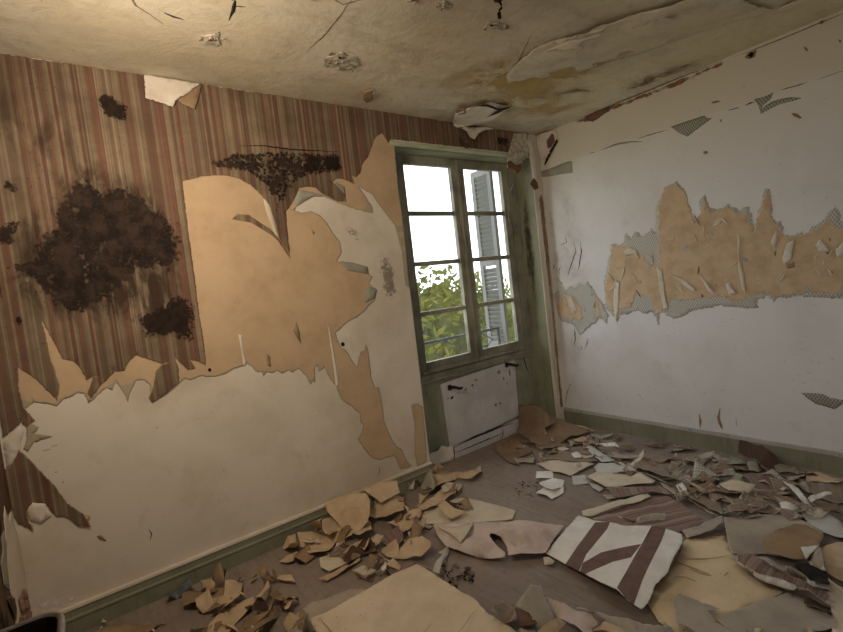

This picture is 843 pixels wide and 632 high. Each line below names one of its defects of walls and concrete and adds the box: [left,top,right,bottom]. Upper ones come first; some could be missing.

crack [306,0,360,52]
leakage [475,62,600,113]
leakage [212,150,342,211]
leakage [0,221,20,244]
leakage [7,172,195,341]
peeling [539,181,843,407]
peeling [4,423,24,467]
peeling [27,503,51,523]
flaking render [0,506,32,624]